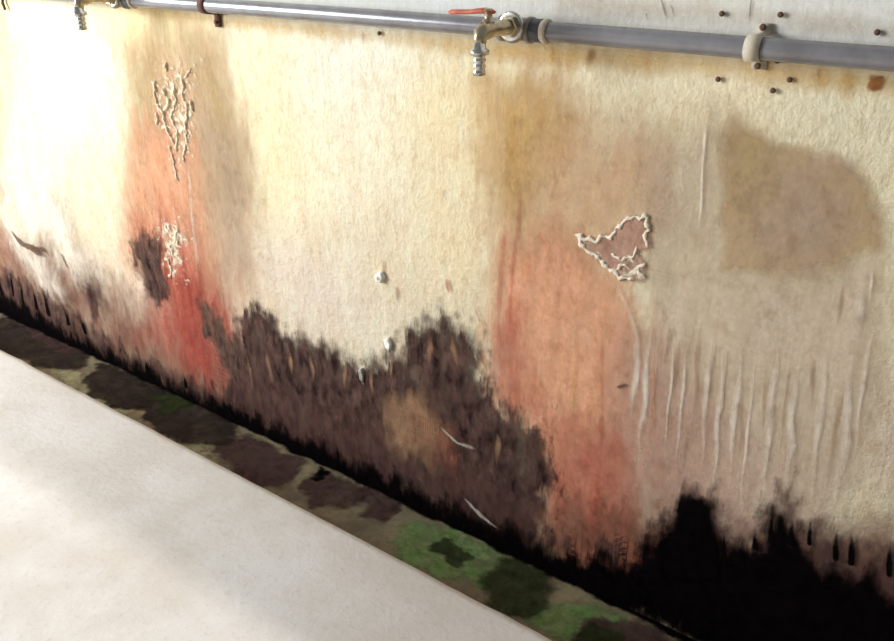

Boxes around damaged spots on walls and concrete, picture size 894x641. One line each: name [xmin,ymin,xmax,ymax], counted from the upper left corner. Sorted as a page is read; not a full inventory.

water stain [131,216,188,306]
water stain [152,62,195,181]
rust [132,56,233,385]
water stain [0,236,894,641]
rust [494,99,695,572]
flaking render [574,212,652,281]
water stain [632,129,878,467]